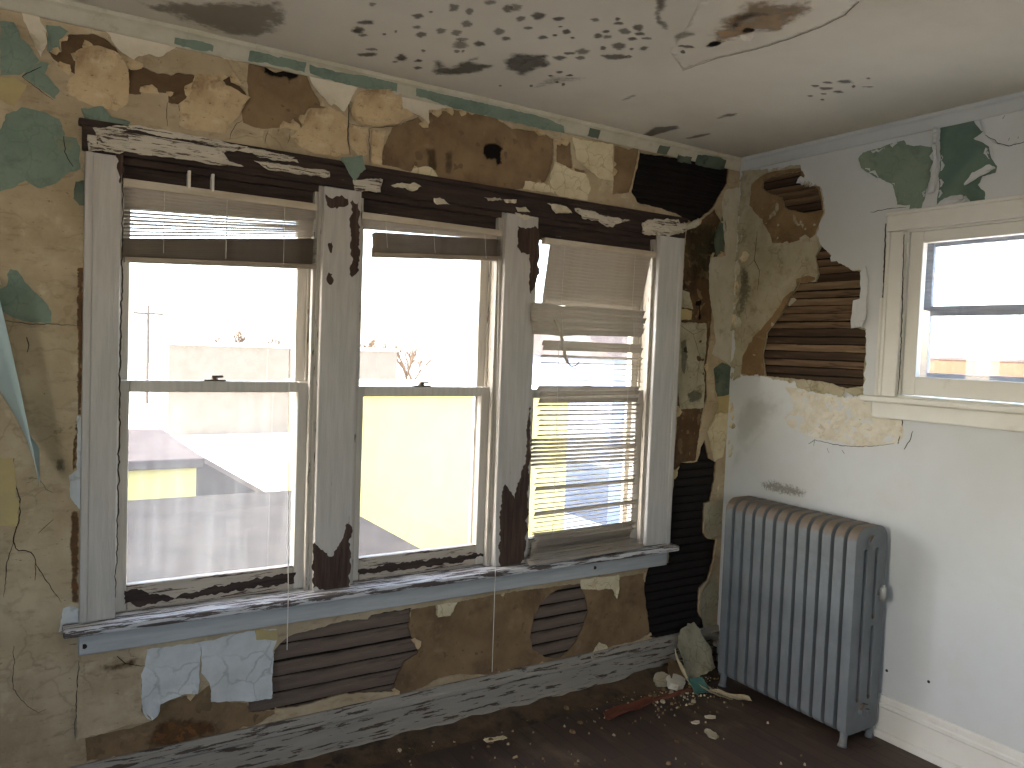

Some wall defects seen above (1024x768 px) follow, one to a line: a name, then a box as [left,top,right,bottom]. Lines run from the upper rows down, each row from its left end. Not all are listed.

spalling [22,13,195,104]
damp [154,3,281,35]
spalling [217,64,358,130]
mould [434,62,491,74]
mould [506,52,574,83]
mould [595,18,647,59]
damp [706,2,809,47]
peeling [87,125,330,183]
spalling [325,97,584,293]
spalling [273,164,904,695]
crack [3,487,61,602]
peeling [124,572,296,607]